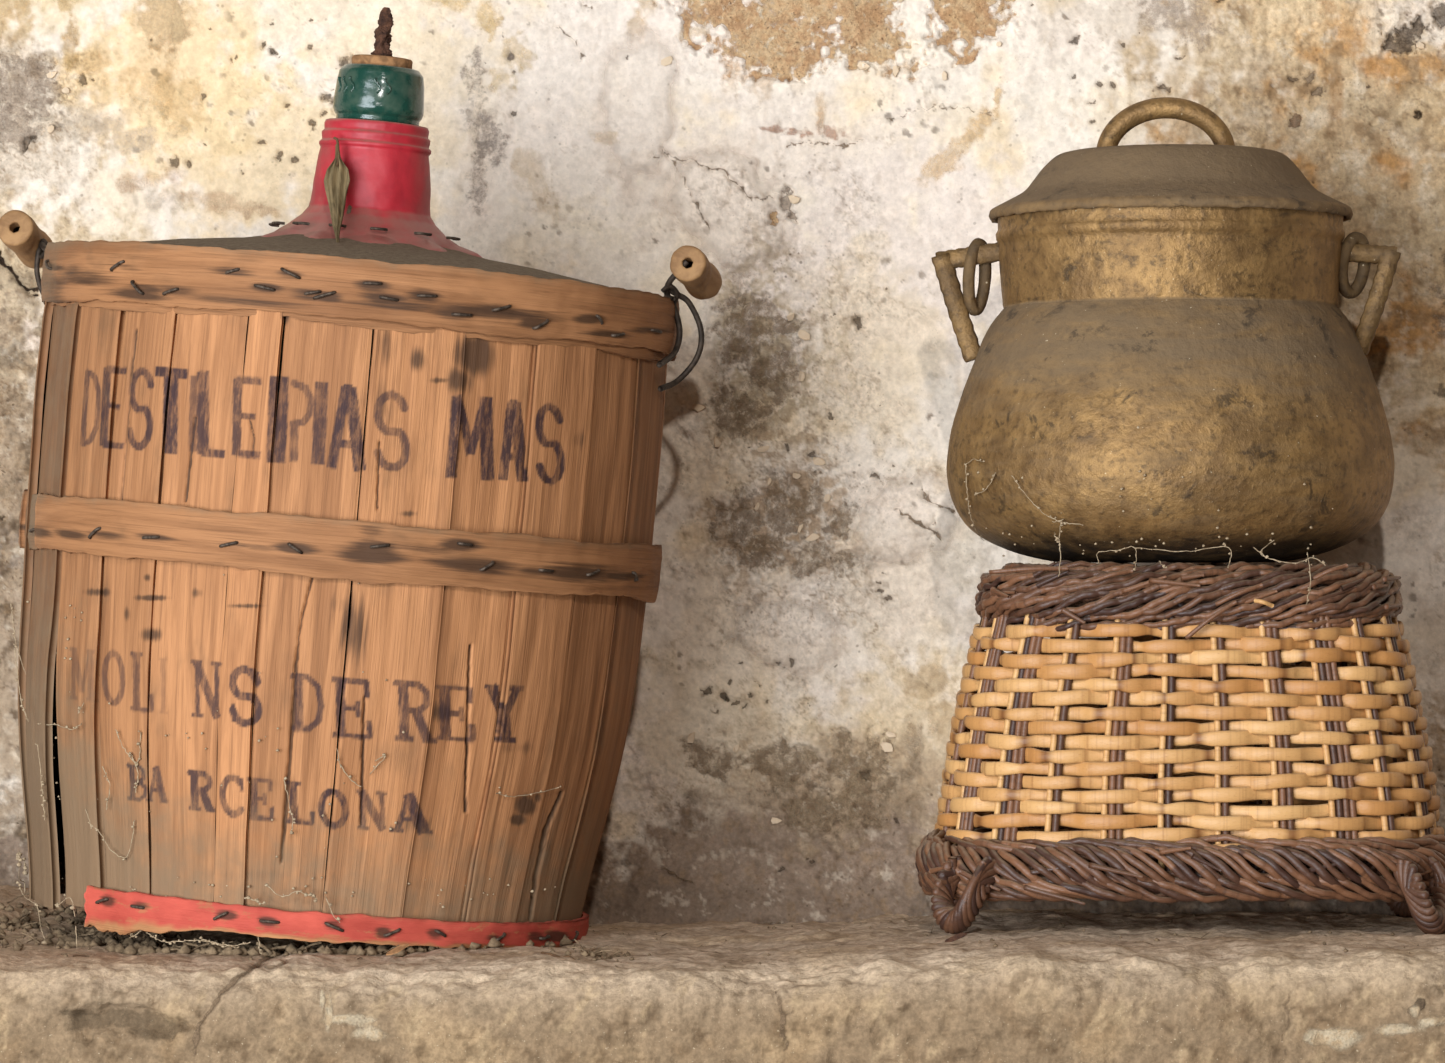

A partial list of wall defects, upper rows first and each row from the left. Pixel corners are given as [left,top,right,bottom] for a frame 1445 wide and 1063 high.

spalling [680,0,918,82]
spalling [927,0,1033,80]
crack [0,251,38,296]
crack [192,944,307,1055]